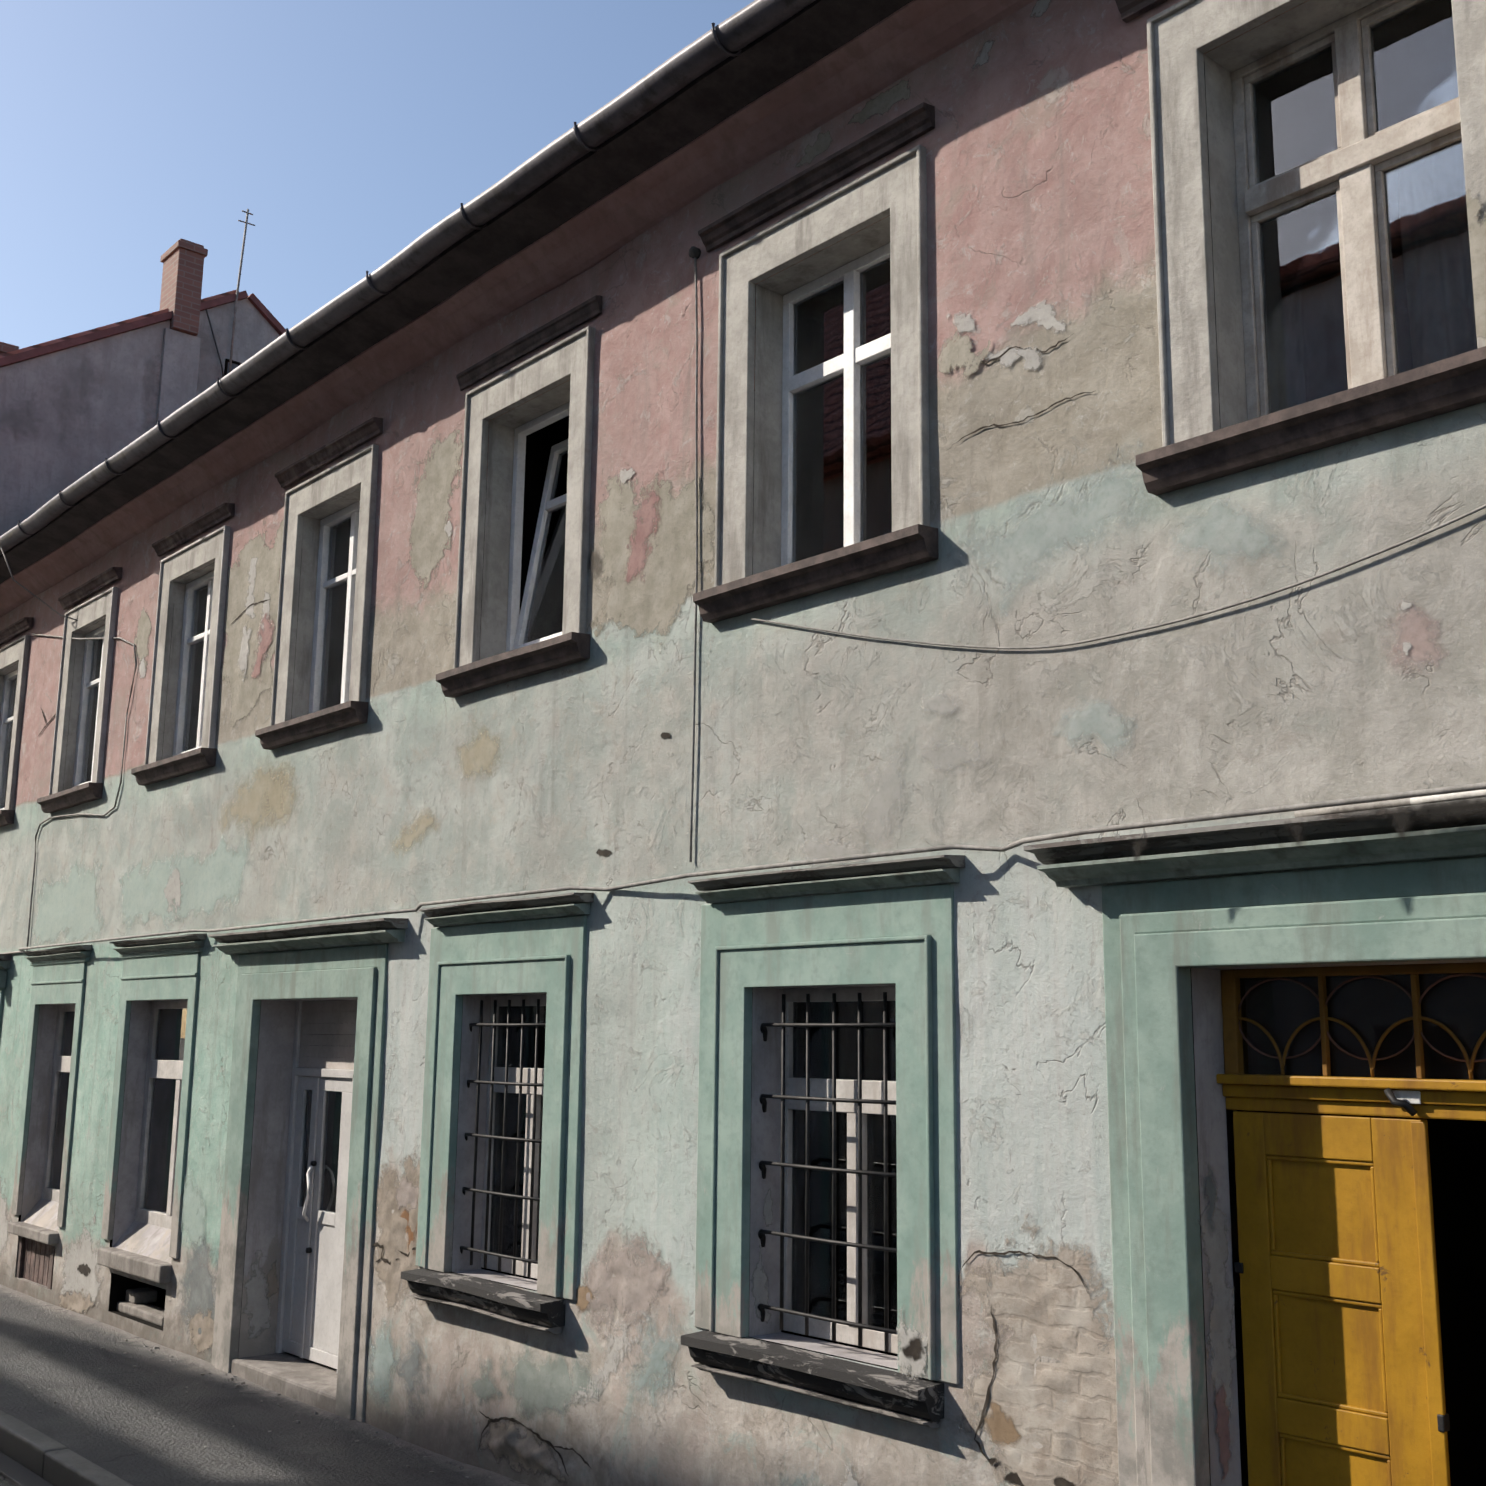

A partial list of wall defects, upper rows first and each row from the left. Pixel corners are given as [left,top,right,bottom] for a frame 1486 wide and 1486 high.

peeling [1466,190,1486,338]
peeling [938,311,1042,379]
crack [980,337,1069,365]
peeling [1011,300,1066,333]
crack [947,391,1094,450]
peeling [373,1153,420,1309]
peeling [576,1232,671,1339]
spalling [958,1215,1119,1486]
crack [478,1410,590,1475]